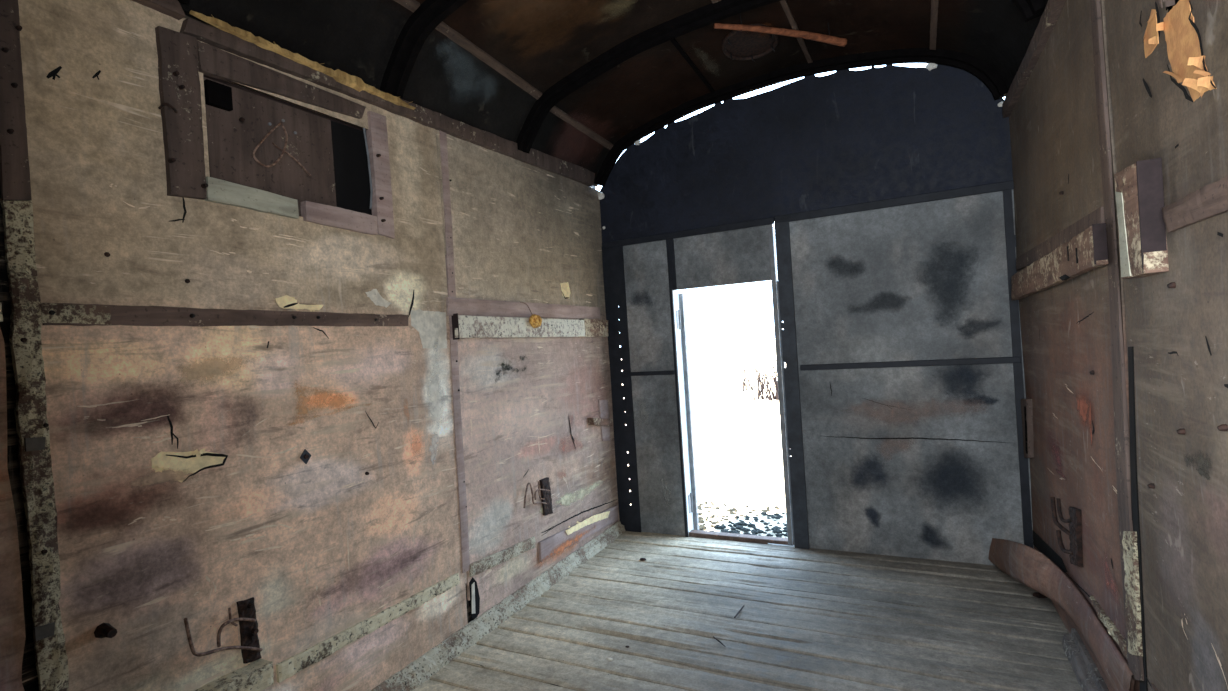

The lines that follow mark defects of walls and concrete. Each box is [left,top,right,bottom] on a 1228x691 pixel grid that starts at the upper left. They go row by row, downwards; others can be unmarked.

peeling [1143,0,1217,102]
damp [856,293,905,311]
damp [924,251,969,318]
damp [960,321,999,336]
damp [943,365,997,405]
peeling [84,415,299,483]
damp [929,453,978,500]
damp [866,509,879,526]
damp [923,526,946,547]